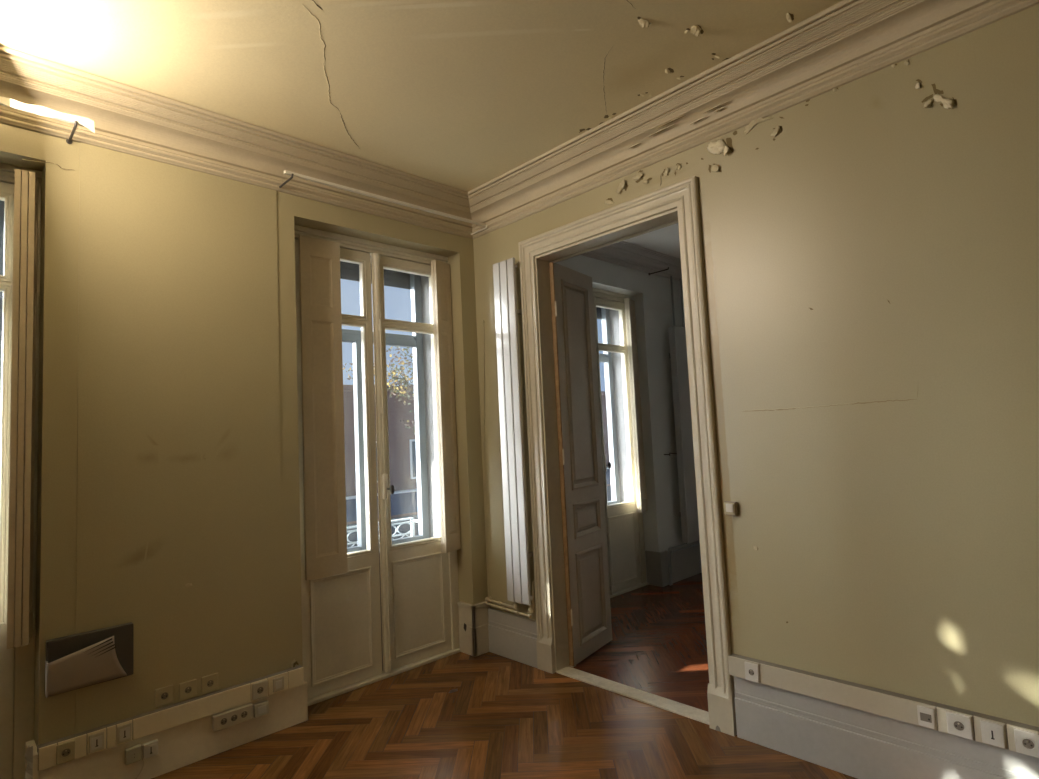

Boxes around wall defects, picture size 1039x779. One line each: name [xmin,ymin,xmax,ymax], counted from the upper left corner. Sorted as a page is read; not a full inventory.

crack [301,0,360,149]
peeling [915,79,957,110]